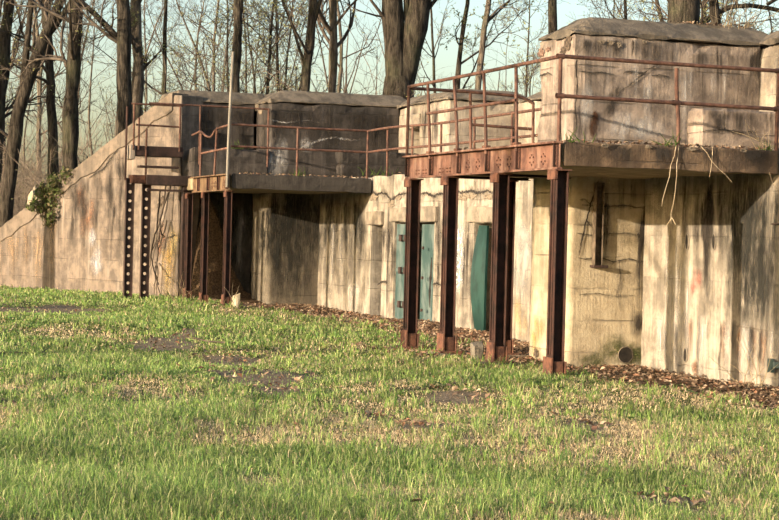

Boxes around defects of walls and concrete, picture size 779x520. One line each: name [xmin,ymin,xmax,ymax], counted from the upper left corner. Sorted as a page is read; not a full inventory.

damp [748,50,761,89]
corrosion [590,111,598,137]
damp [215,196,365,281]
crack [578,194,644,305]
damp [683,177,778,364]